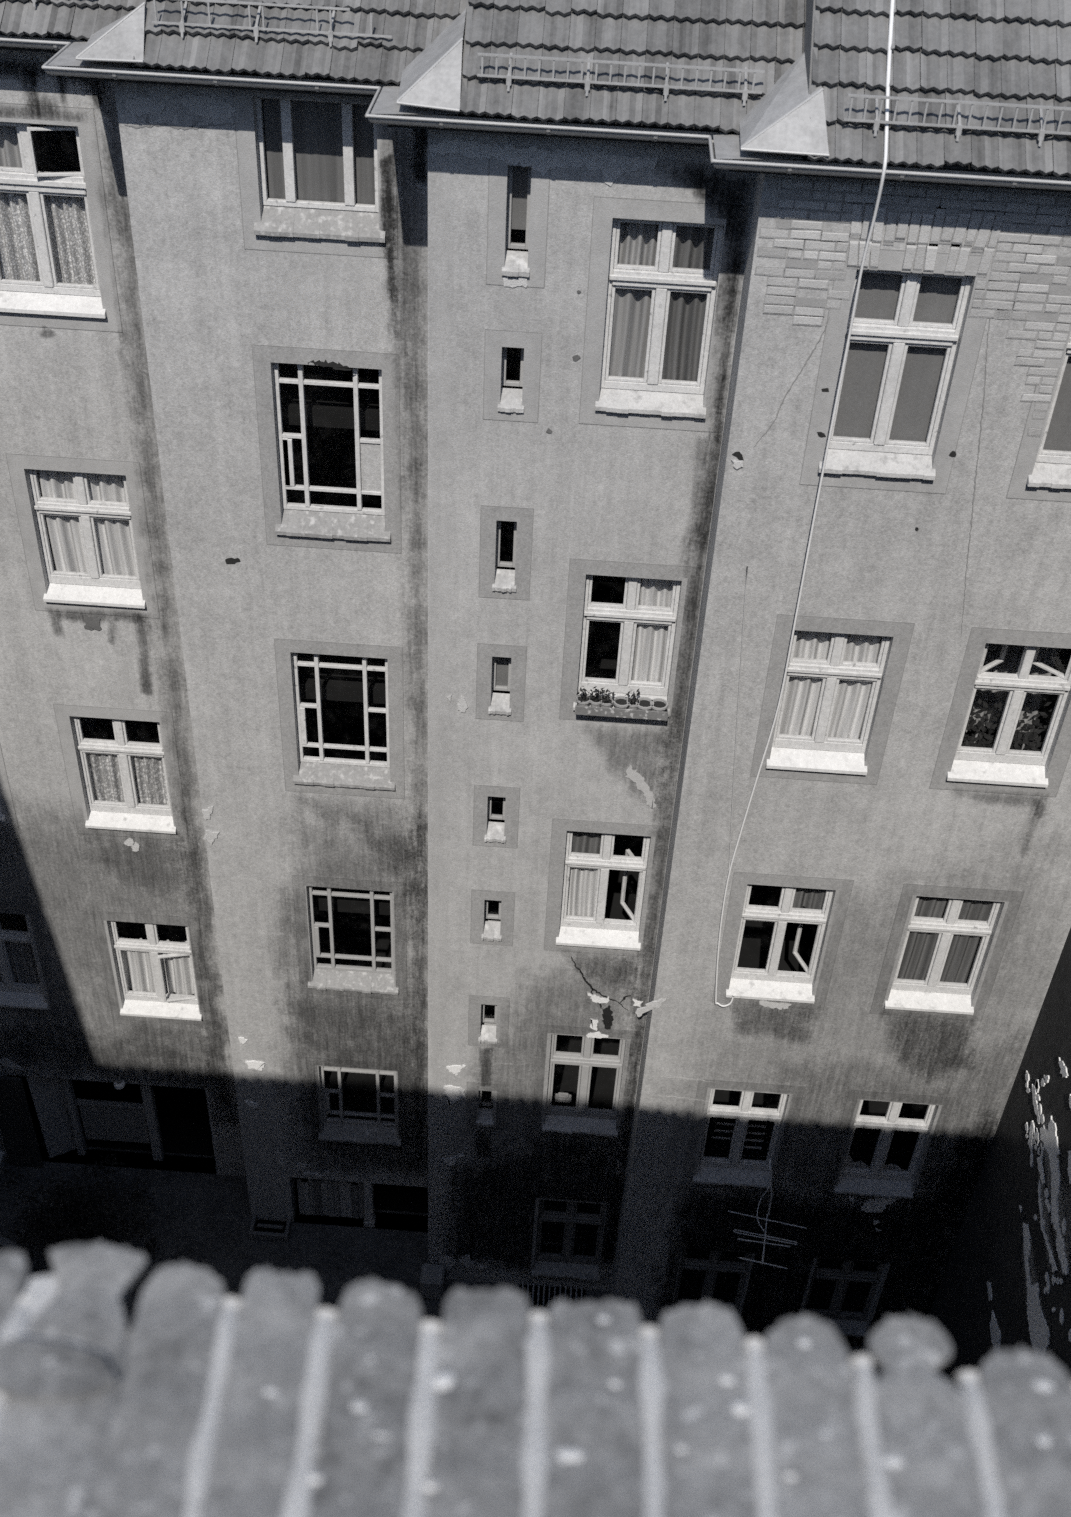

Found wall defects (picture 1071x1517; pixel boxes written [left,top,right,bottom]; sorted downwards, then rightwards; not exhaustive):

water stain [0,60,106,118]
water stain [380,129,427,310]
water stain [609,166,750,1259]
peeling [1019,1057,1071,1355]
peeling [987,1281,1001,1351]